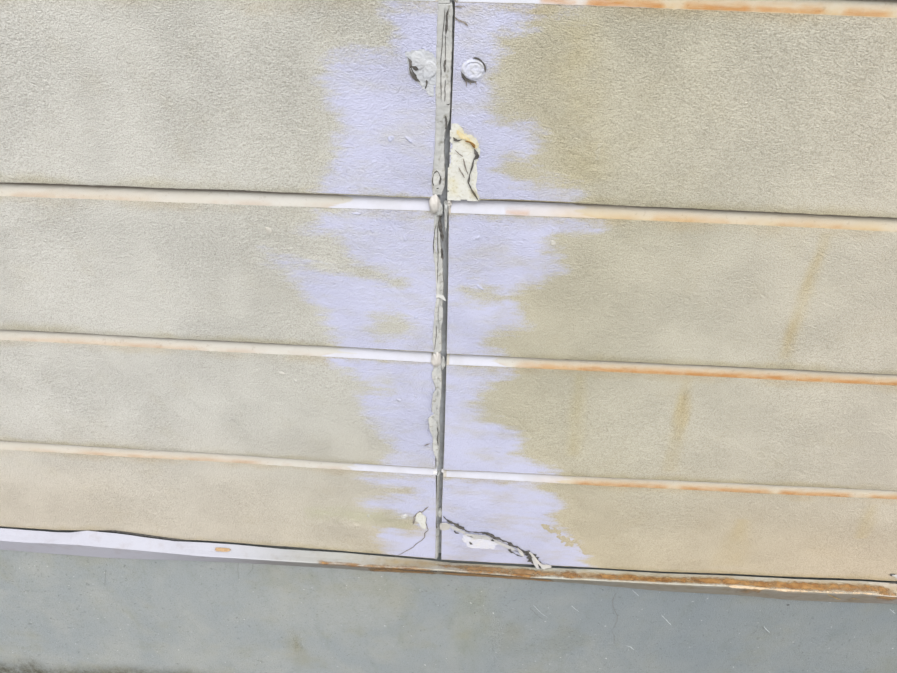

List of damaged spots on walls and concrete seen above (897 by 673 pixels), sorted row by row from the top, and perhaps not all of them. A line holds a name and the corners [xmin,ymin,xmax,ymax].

crack [440,5,486,129]
spalling [447,123,480,201]
crack [432,170,447,350]
corrosion [344,563,897,600]